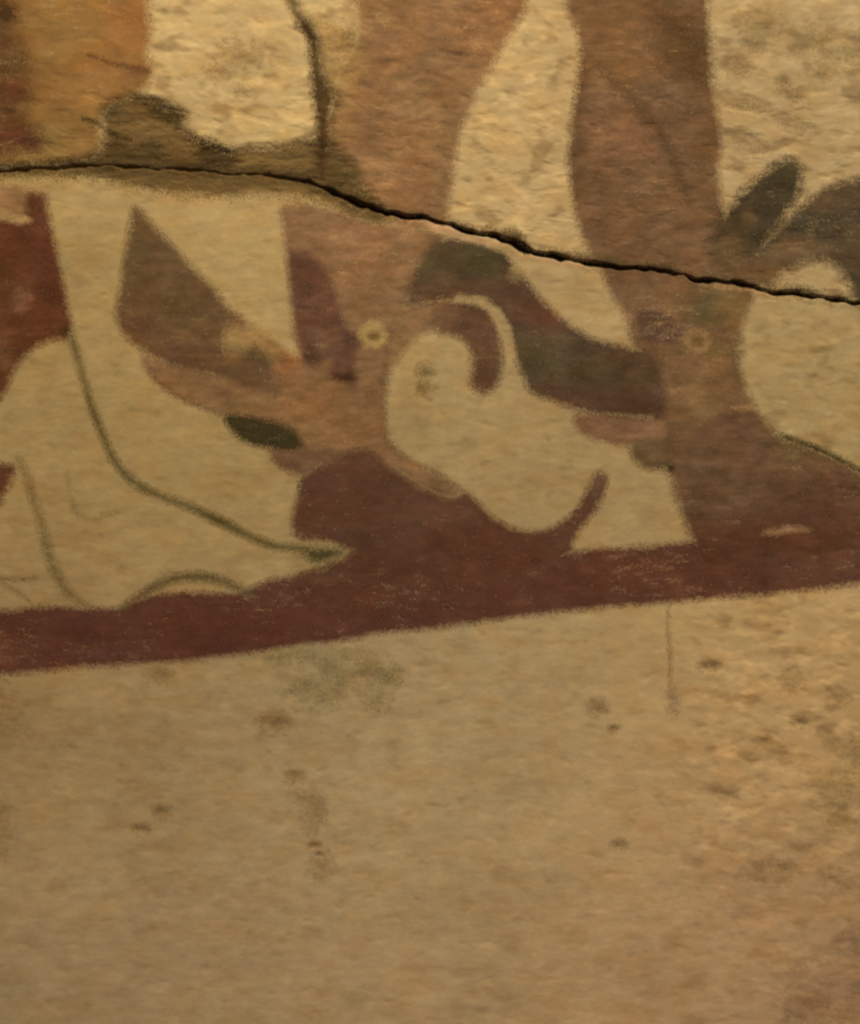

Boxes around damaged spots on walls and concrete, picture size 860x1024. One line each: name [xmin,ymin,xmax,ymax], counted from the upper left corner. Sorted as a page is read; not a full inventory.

crack [0,0,860,310]